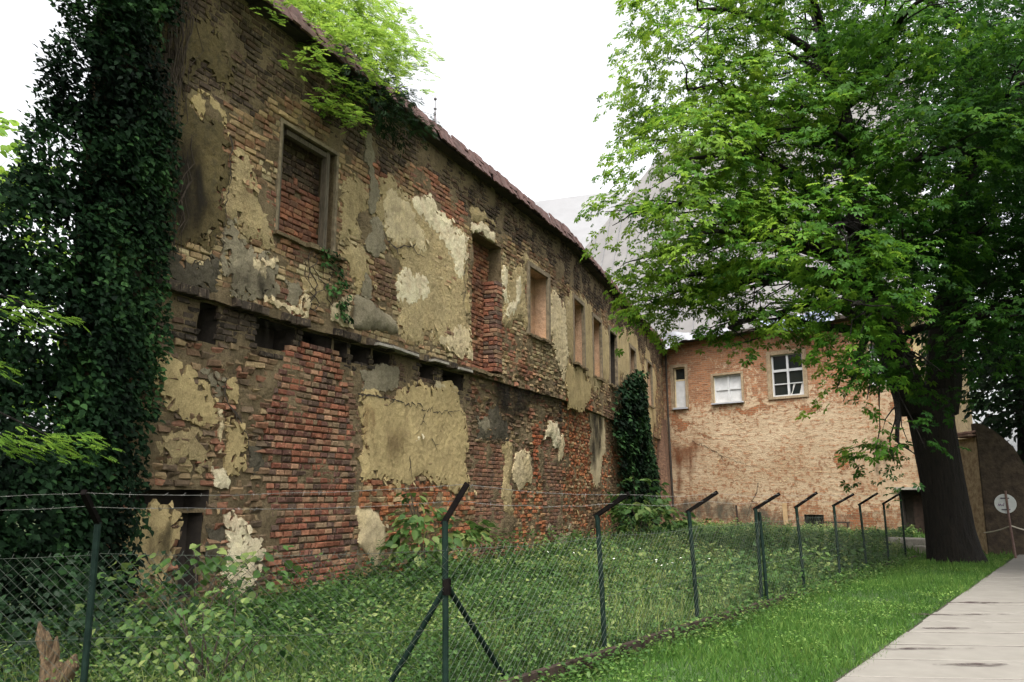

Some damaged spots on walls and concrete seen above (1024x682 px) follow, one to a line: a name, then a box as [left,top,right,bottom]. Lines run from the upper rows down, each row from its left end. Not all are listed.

peeling [136,6,496,361]
peeling [148,351,264,489]
peeling [501,438,533,516]